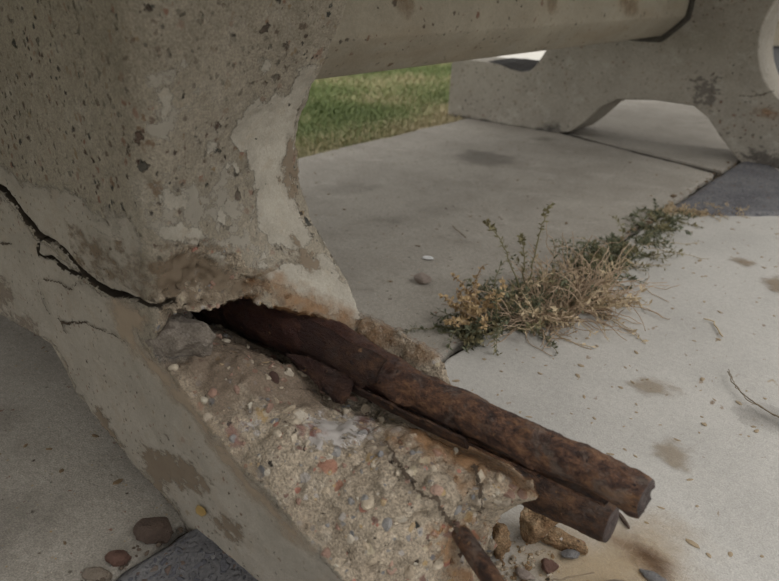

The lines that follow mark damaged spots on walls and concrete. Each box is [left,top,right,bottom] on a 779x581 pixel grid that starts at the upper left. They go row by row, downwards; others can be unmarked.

crack [0,184,178,345]
peeling [146,59,191,140]
peeling [158,187,190,210]
peeling [225,64,316,251]
peeling [155,220,450,384]
peeling [138,444,244,546]
spalling [154,323,538,581]
crack [385,441,459,533]
corrosion [267,344,609,507]
crack [471,464,486,513]